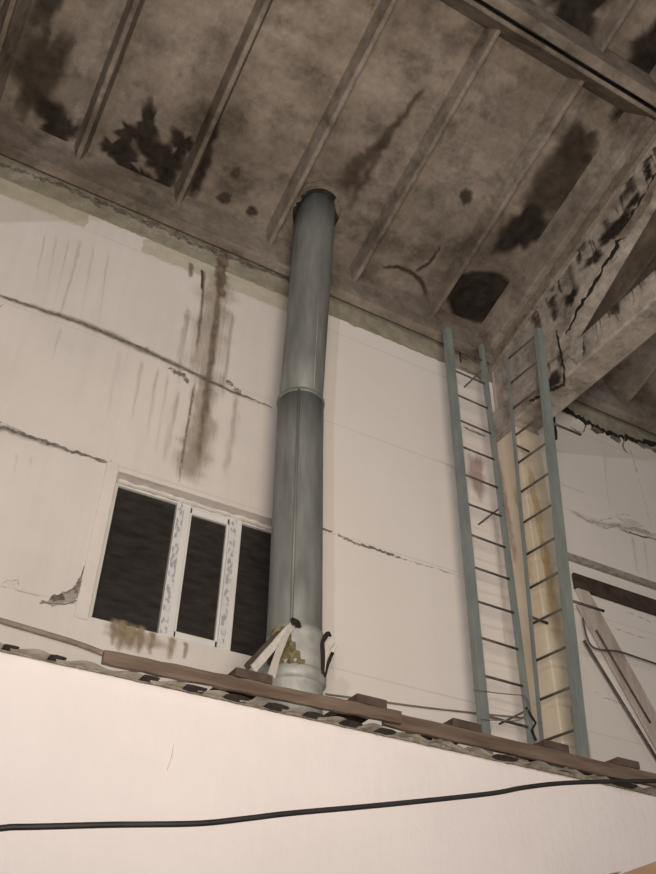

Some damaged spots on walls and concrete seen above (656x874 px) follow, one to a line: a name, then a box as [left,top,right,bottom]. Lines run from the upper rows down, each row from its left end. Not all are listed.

damp [549,0,605,37]
damp [15,0,118,142]
damp [629,21,656,74]
damp [101,102,193,188]
damp [189,128,217,194]
damp [448,272,509,322]
crack [1,296,272,408]
crack [529,173,656,481]
crack [0,422,112,463]
crack [583,504,655,540]
crack [323,528,449,573]
flaking render [39,565,85,607]